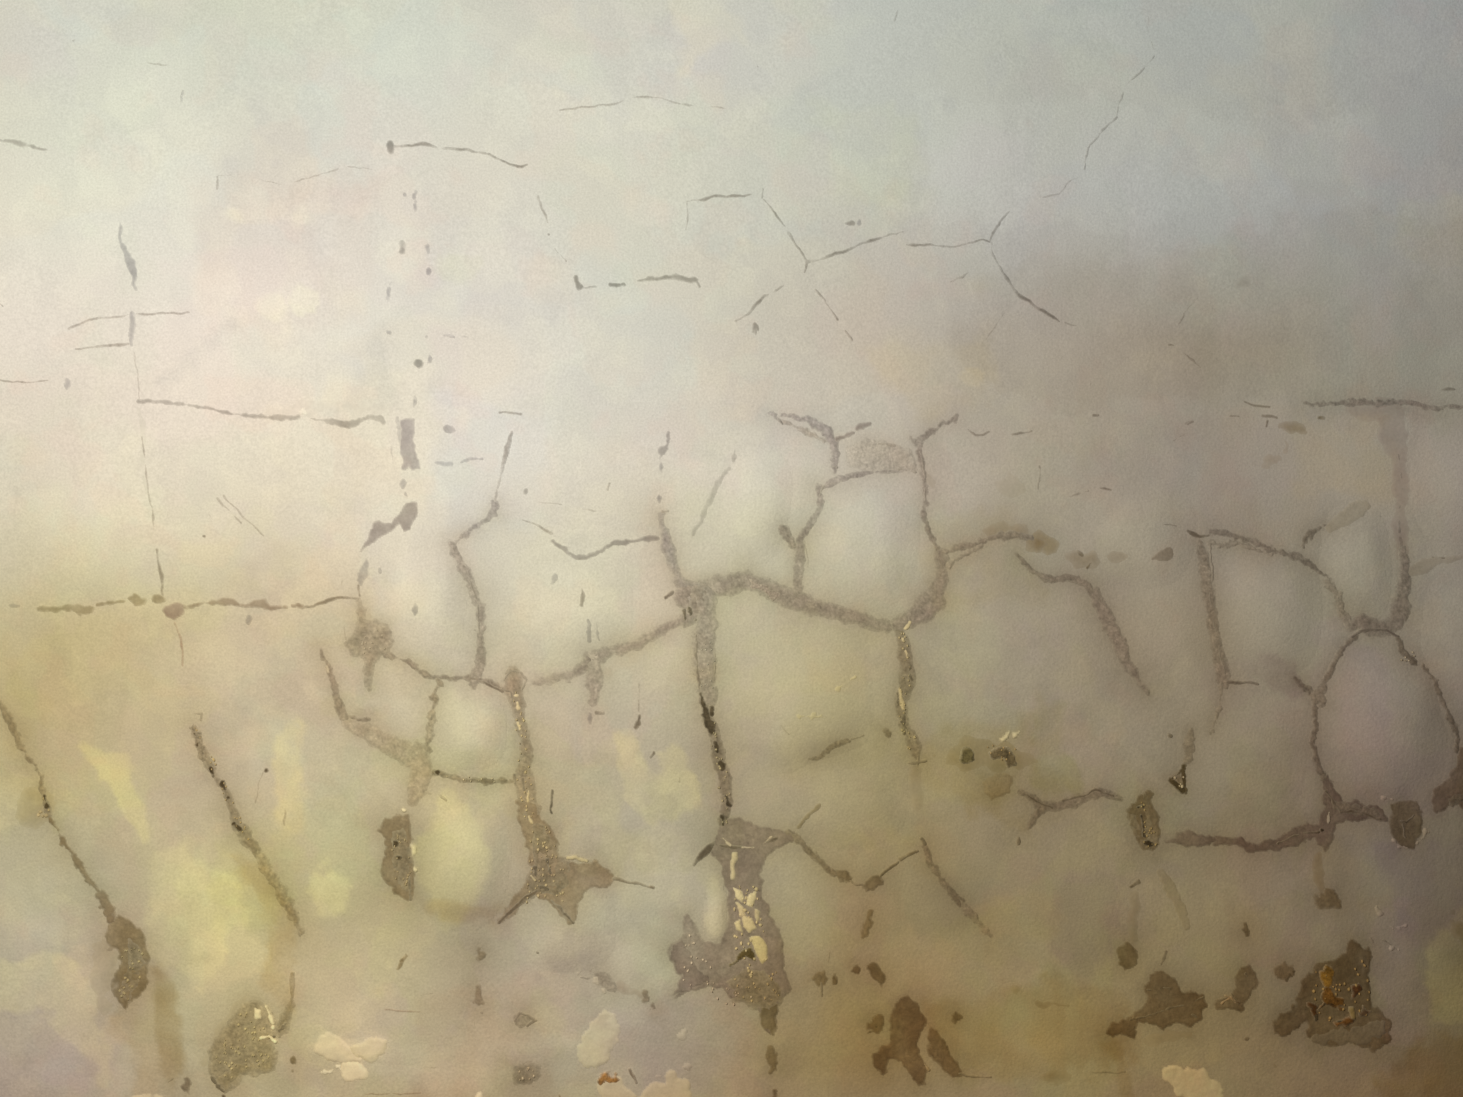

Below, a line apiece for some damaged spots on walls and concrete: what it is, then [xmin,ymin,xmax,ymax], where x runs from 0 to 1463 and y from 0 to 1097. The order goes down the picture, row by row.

crack [9,190,468,666]
crack [319,411,1150,938]
crack [1164,387,1463,781]
crack [0,699,117,924]
crack [189,712,305,937]
spalling [497,799,655,925]
spalling [666,816,886,1036]
spalling [1125,746,1463,853]
water stain [1312,852,1342,910]
spalling [131,995,297,1097]
water stain [765,1045,778,1097]
spalling [866,995,992,1087]